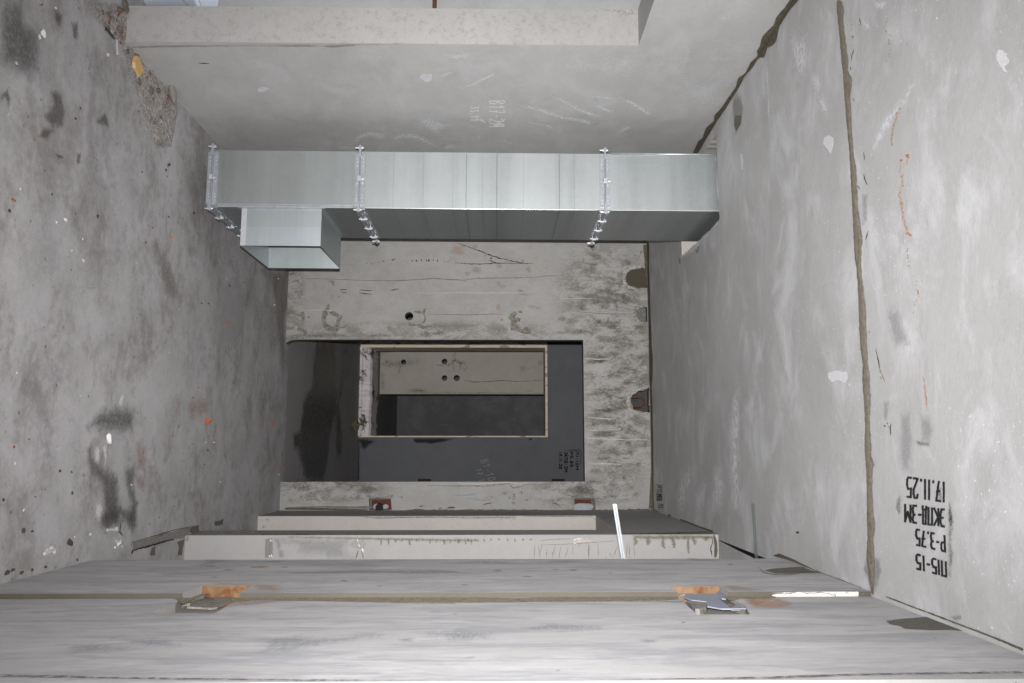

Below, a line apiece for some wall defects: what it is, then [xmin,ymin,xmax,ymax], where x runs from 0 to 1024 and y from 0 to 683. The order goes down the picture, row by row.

spalling [84,0,178,147]
leakage [90,445,136,548]